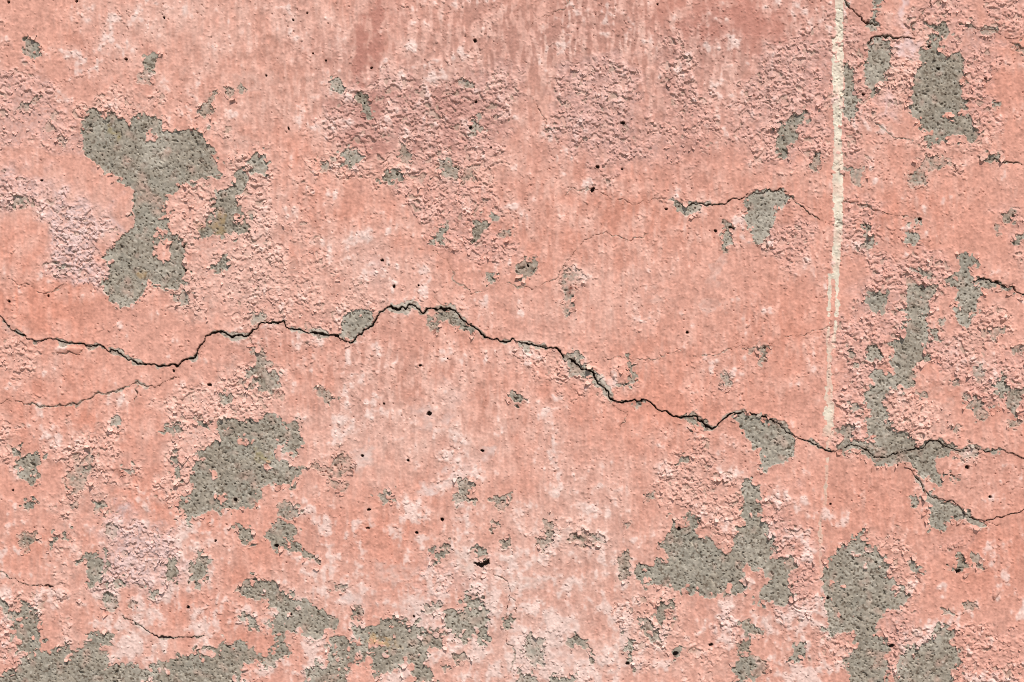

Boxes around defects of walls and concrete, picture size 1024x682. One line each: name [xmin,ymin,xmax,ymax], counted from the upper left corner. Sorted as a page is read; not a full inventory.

peeling [0,49,388,347]
crack [567,187,820,220]
peeling [719,186,818,269]
peeling [737,0,1024,189]
peeling [155,338,358,571]
peeling [0,415,516,682]
crack [1,232,1024,527]
peeling [614,409,1024,682]
peeling [833,200,1024,578]